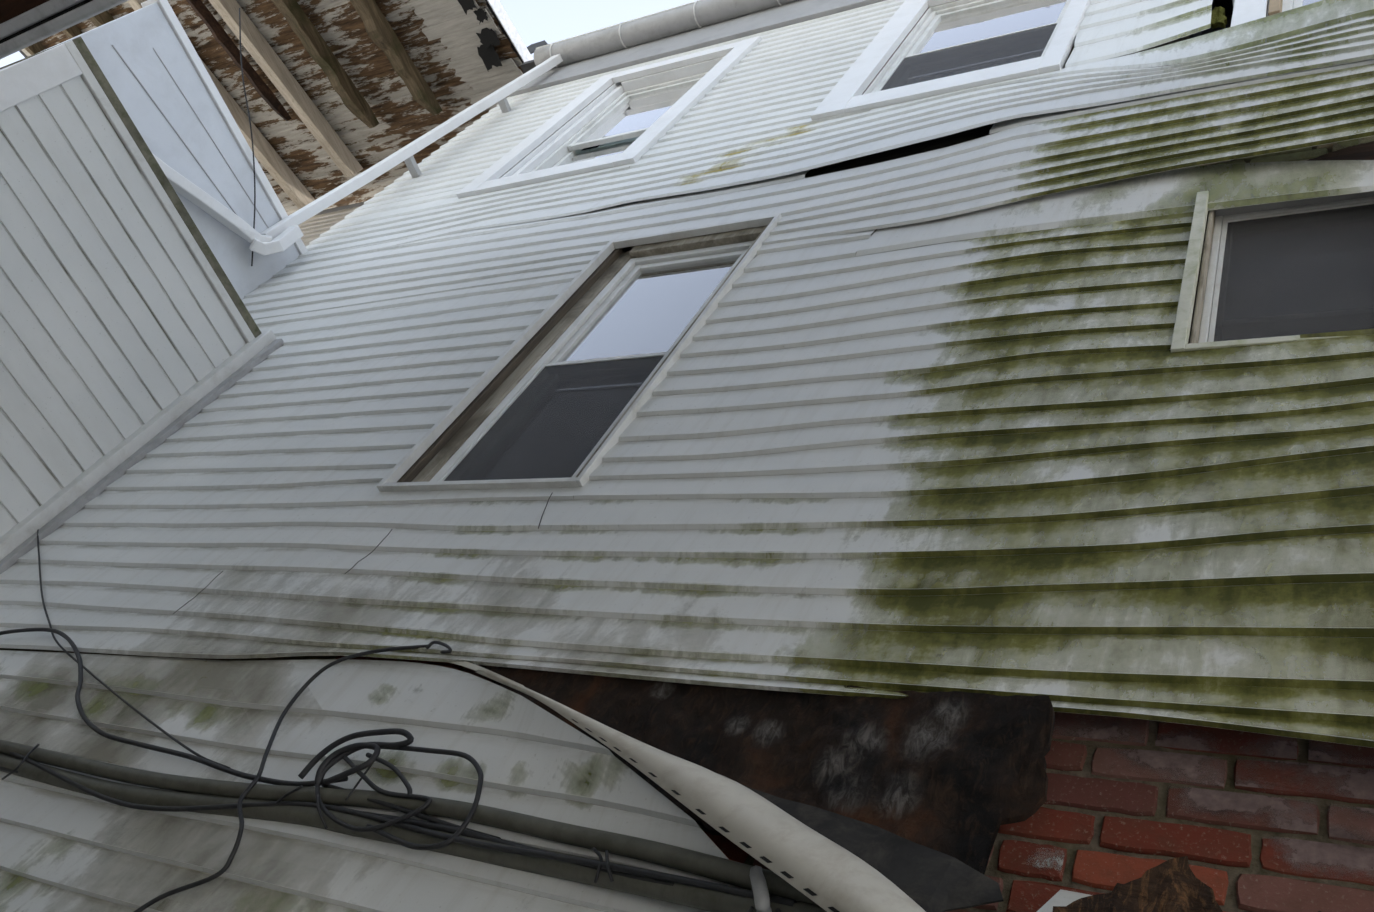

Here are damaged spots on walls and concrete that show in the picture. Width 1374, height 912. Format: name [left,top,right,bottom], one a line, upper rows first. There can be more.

water stain [783,0,1374,748]
water stain [678,553,781,564]
water stain [298,626,464,661]
water stain [0,672,68,745]
water stain [80,654,272,764]